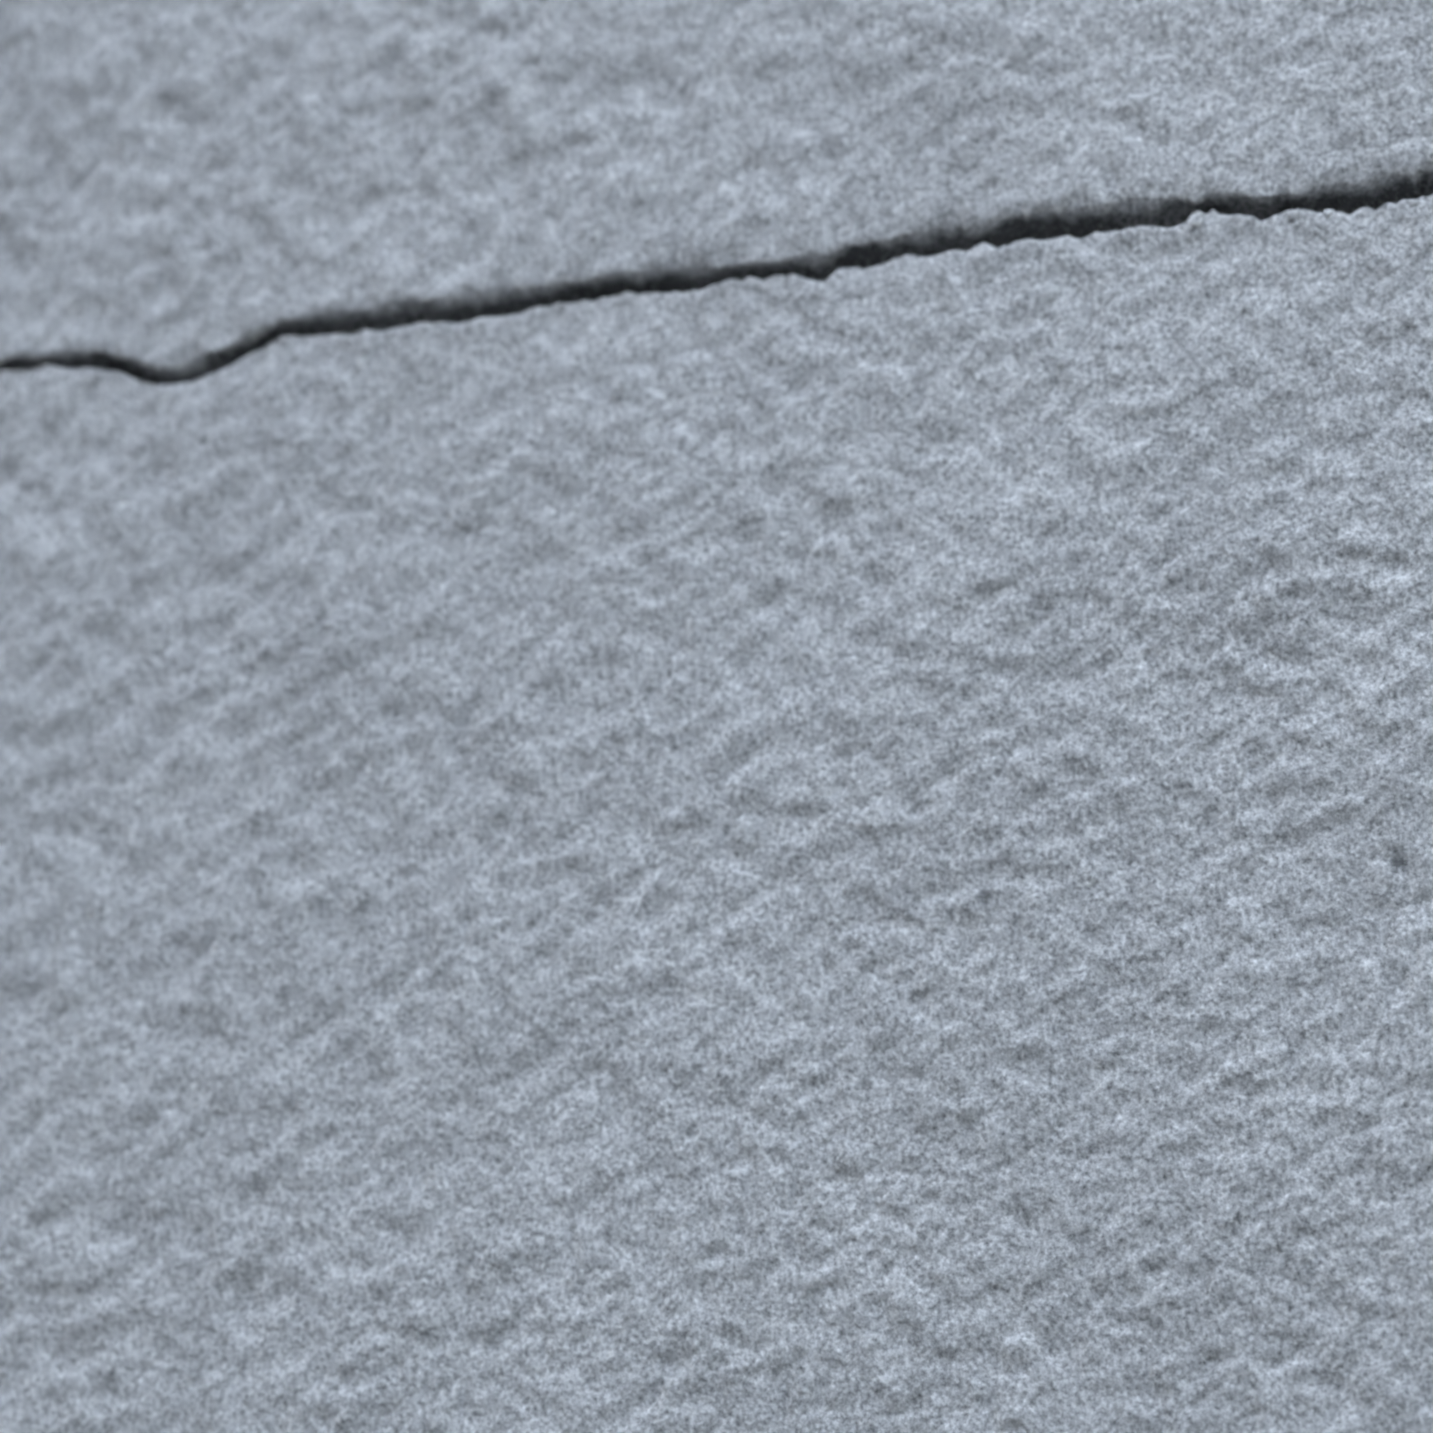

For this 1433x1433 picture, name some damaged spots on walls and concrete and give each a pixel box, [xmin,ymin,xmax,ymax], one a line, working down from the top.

crack [0,175,1433,386]